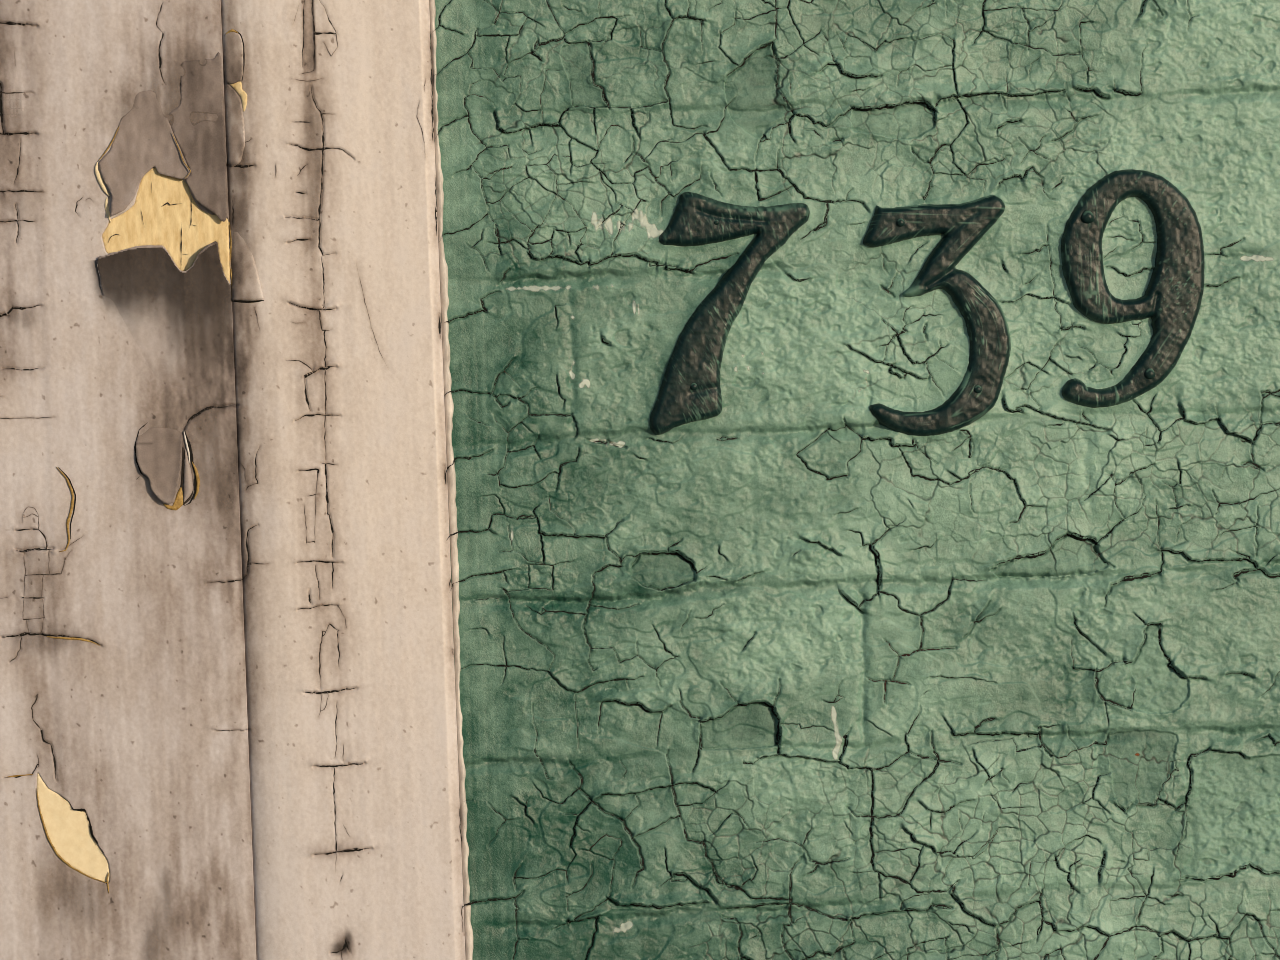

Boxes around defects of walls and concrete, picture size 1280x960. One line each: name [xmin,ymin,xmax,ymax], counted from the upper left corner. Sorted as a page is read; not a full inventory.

crack [0,21,36,243]
peeling [95,29,264,389]
crack [0,305,38,317]
peeling [134,422,200,510]
crack [234,0,387,881]
crack [417,0,1280,960]
crack [0,507,98,662]
spalling [631,554,695,590]
peeling [8,774,109,893]